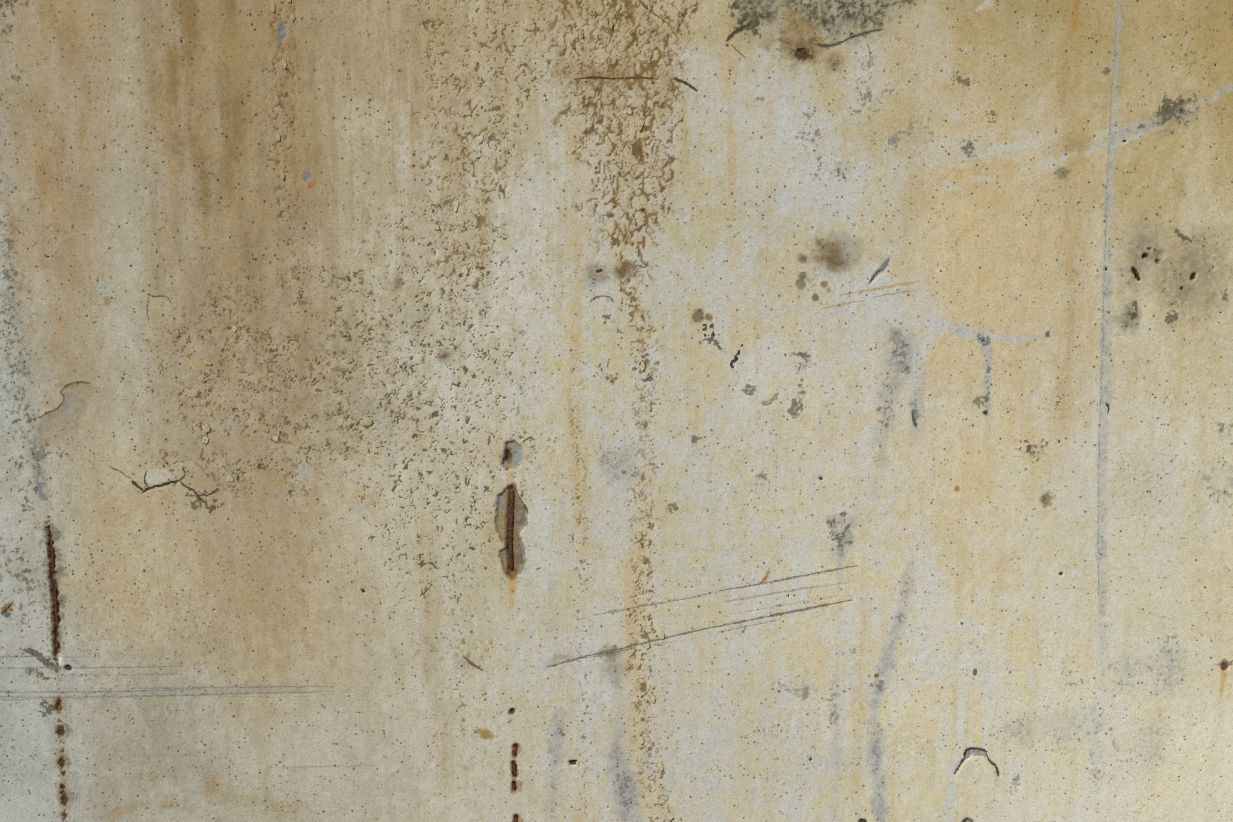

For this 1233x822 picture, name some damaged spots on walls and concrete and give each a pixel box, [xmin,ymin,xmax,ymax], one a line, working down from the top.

water stain [0,0,372,818]
peeling [133,0,714,822]
water stain [513,0,1233,822]
crack [108,466,227,520]
rust [32,515,70,656]
rust [29,680,79,822]
rust [509,741,526,822]